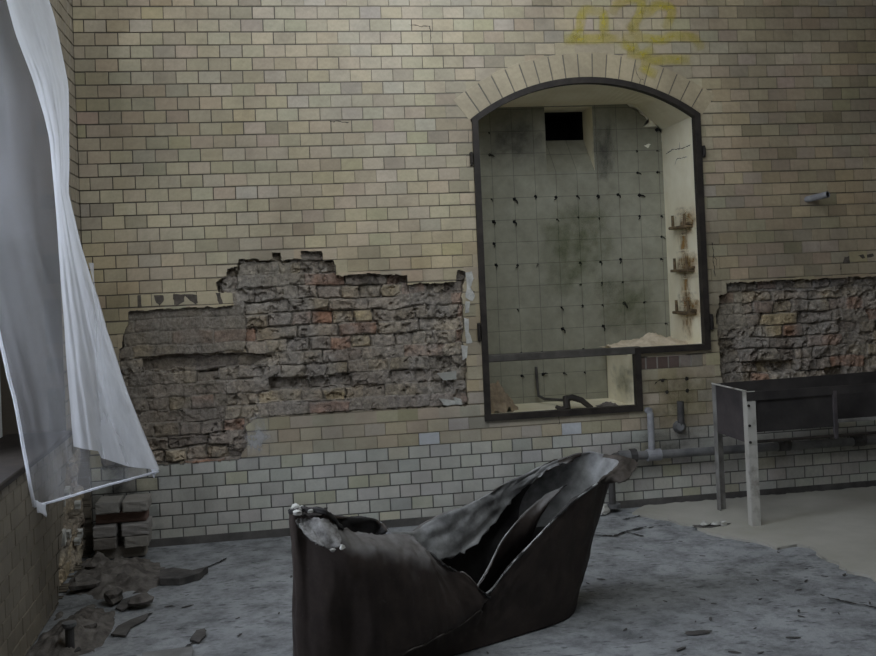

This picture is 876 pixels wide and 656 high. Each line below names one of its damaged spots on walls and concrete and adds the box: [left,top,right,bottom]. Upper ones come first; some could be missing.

spalling [119,251,475,465]
spalling [714,254,876,383]
spalling [102,458,128,468]